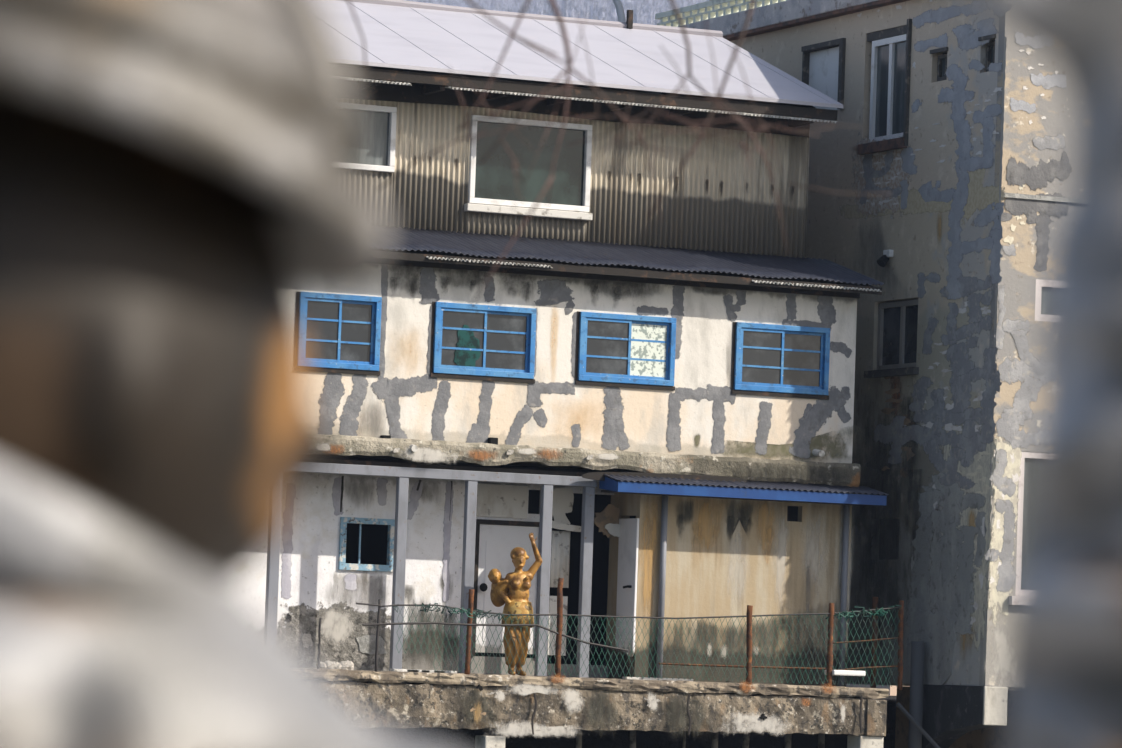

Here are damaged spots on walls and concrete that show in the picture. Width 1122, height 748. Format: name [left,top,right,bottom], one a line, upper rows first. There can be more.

peeling [954,87,1005,225]
peeling [1003,215,1026,245]
water stain [678,502,693,526]
water stain [727,503,751,535]
peeling [922,386,1022,651]
water stain [777,521,787,592]
spalling [278,601,414,670]
water stain [672,615,825,665]
water stain [464,688,494,724]